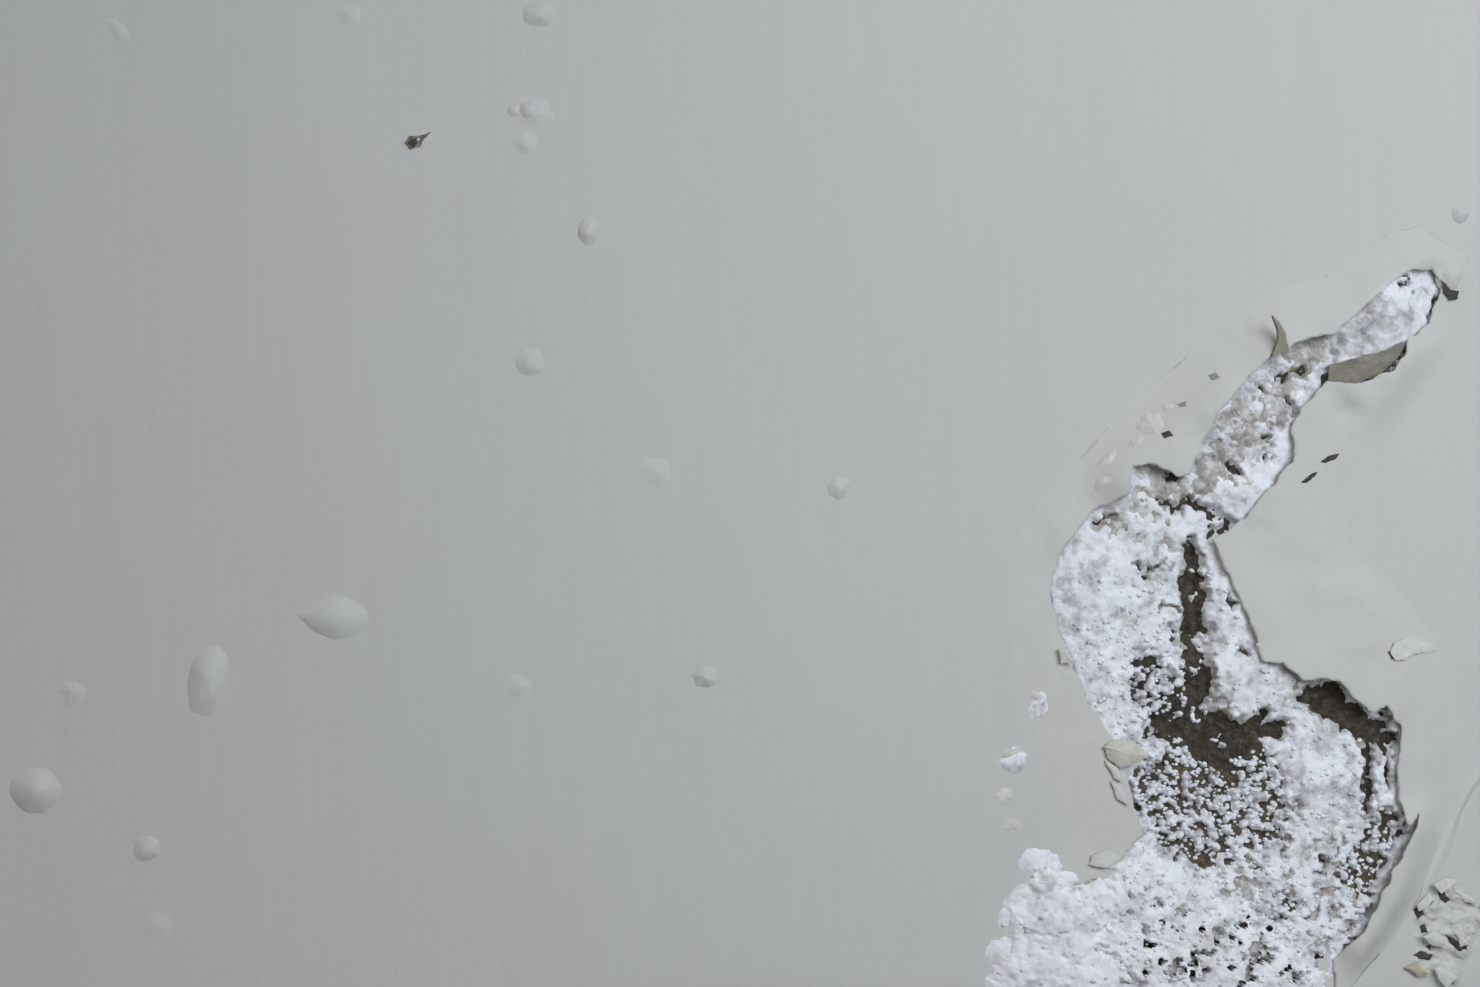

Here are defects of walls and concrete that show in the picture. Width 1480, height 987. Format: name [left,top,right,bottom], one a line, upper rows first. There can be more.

flaking render [1050,269,1440,987]
leakage [984,841,1334,987]
peeling [1404,878,1480,987]